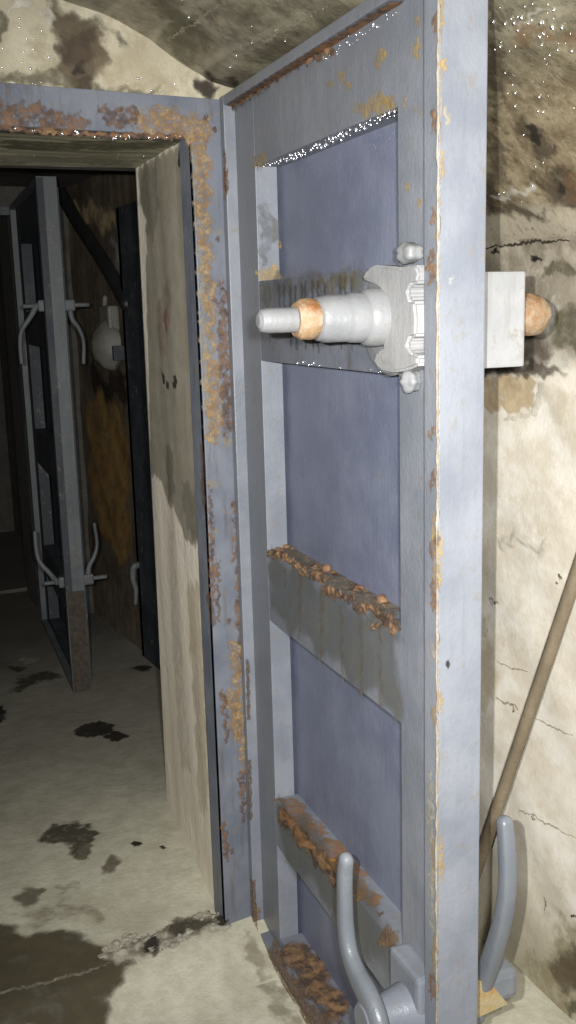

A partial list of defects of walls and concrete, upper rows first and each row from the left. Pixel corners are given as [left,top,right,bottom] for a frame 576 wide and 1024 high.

damp [0,0,110,90]
damp [194,72,238,99]
corrosion [228,2,403,111]
damp [486,144,576,219]
corrosion [0,99,232,445]
crack [485,239,570,262]
corrosion [267,544,401,635]
corrosion [208,486,252,822]
damp [40,823,99,860]
crack [519,810,574,837]
damp [0,925,131,1024]
corrosion [268,940,350,1024]